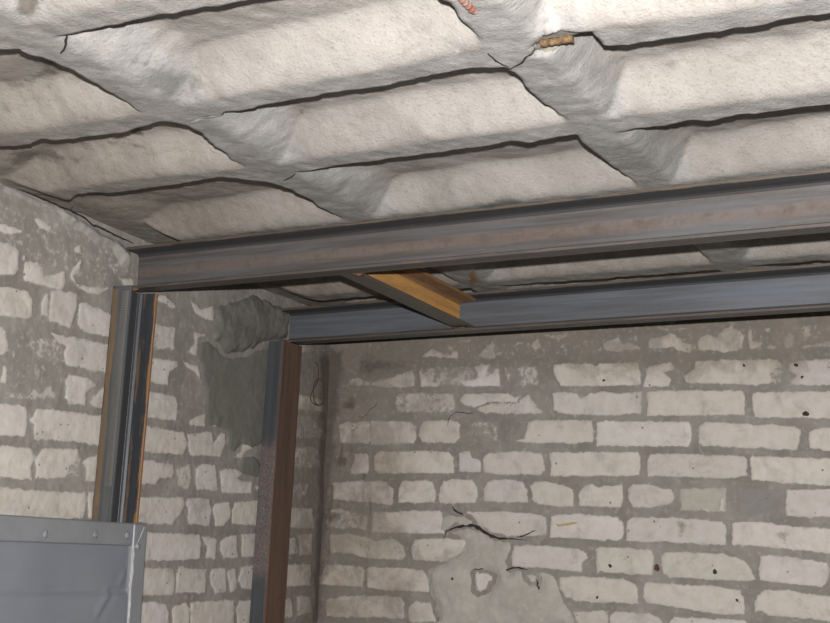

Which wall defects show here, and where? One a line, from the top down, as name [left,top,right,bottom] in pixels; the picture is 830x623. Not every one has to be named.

rust [458,0,478,14]
crack [488,43,539,71]
crack [20,189,133,243]
crack [443,507,535,540]